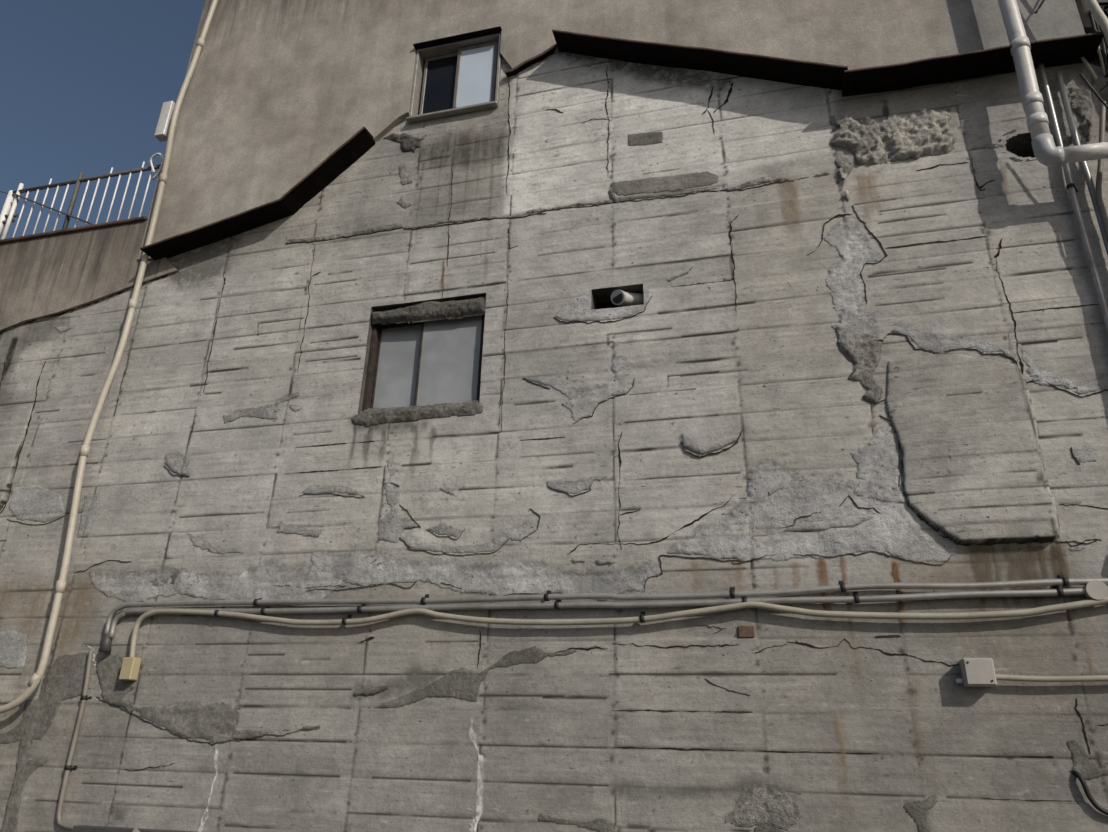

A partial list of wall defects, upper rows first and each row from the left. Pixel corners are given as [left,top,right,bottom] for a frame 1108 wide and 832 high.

spalling [971,130,1037,162]
spalling [285,108,956,244]
water stain [3,338,17,375]
peeling [784,512,874,532]
peeling [353,686,388,696]
water stain [467,720,484,832]
spalling [725,781,802,830]